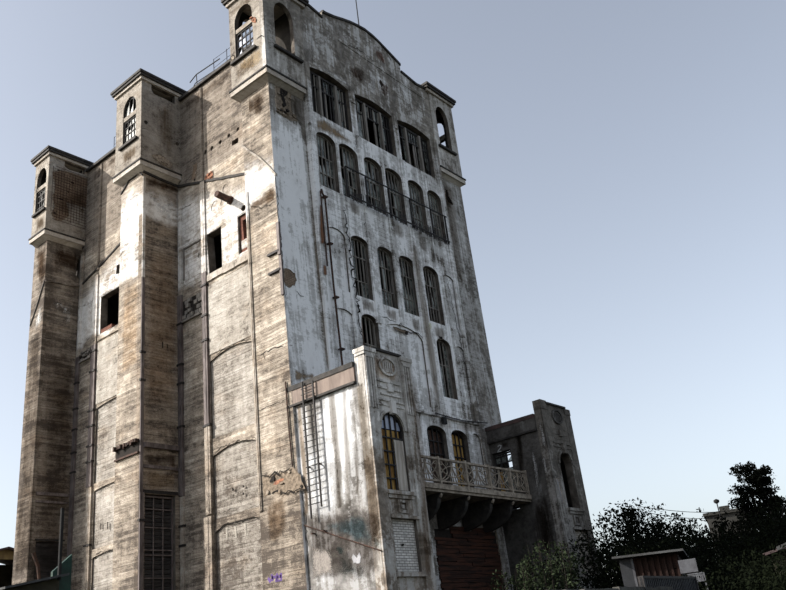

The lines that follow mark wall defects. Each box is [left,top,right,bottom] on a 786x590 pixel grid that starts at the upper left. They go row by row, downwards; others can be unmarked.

spalling [283,268,297,288]
spalling [262,468,305,497]